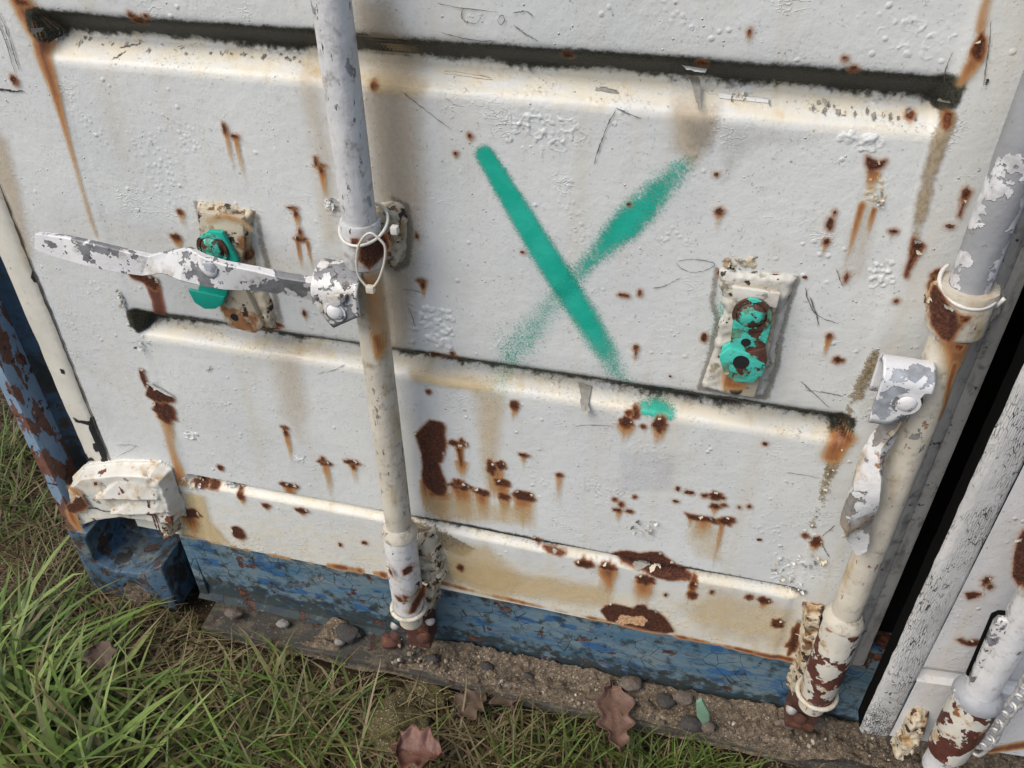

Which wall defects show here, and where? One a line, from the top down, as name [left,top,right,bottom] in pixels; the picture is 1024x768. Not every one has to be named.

rust [9,0,93,225]
rust [221,121,241,161]
rust [865,155,888,187]
rust [286,206,311,260]
rust [850,201,877,248]
rust [903,237,926,279]
rust [926,268,972,420]
rust [139,368,224,490]
rust [617,403,668,440]
rust [412,420,536,523]
rust [673,487,751,550]
rust [533,537,801,662]